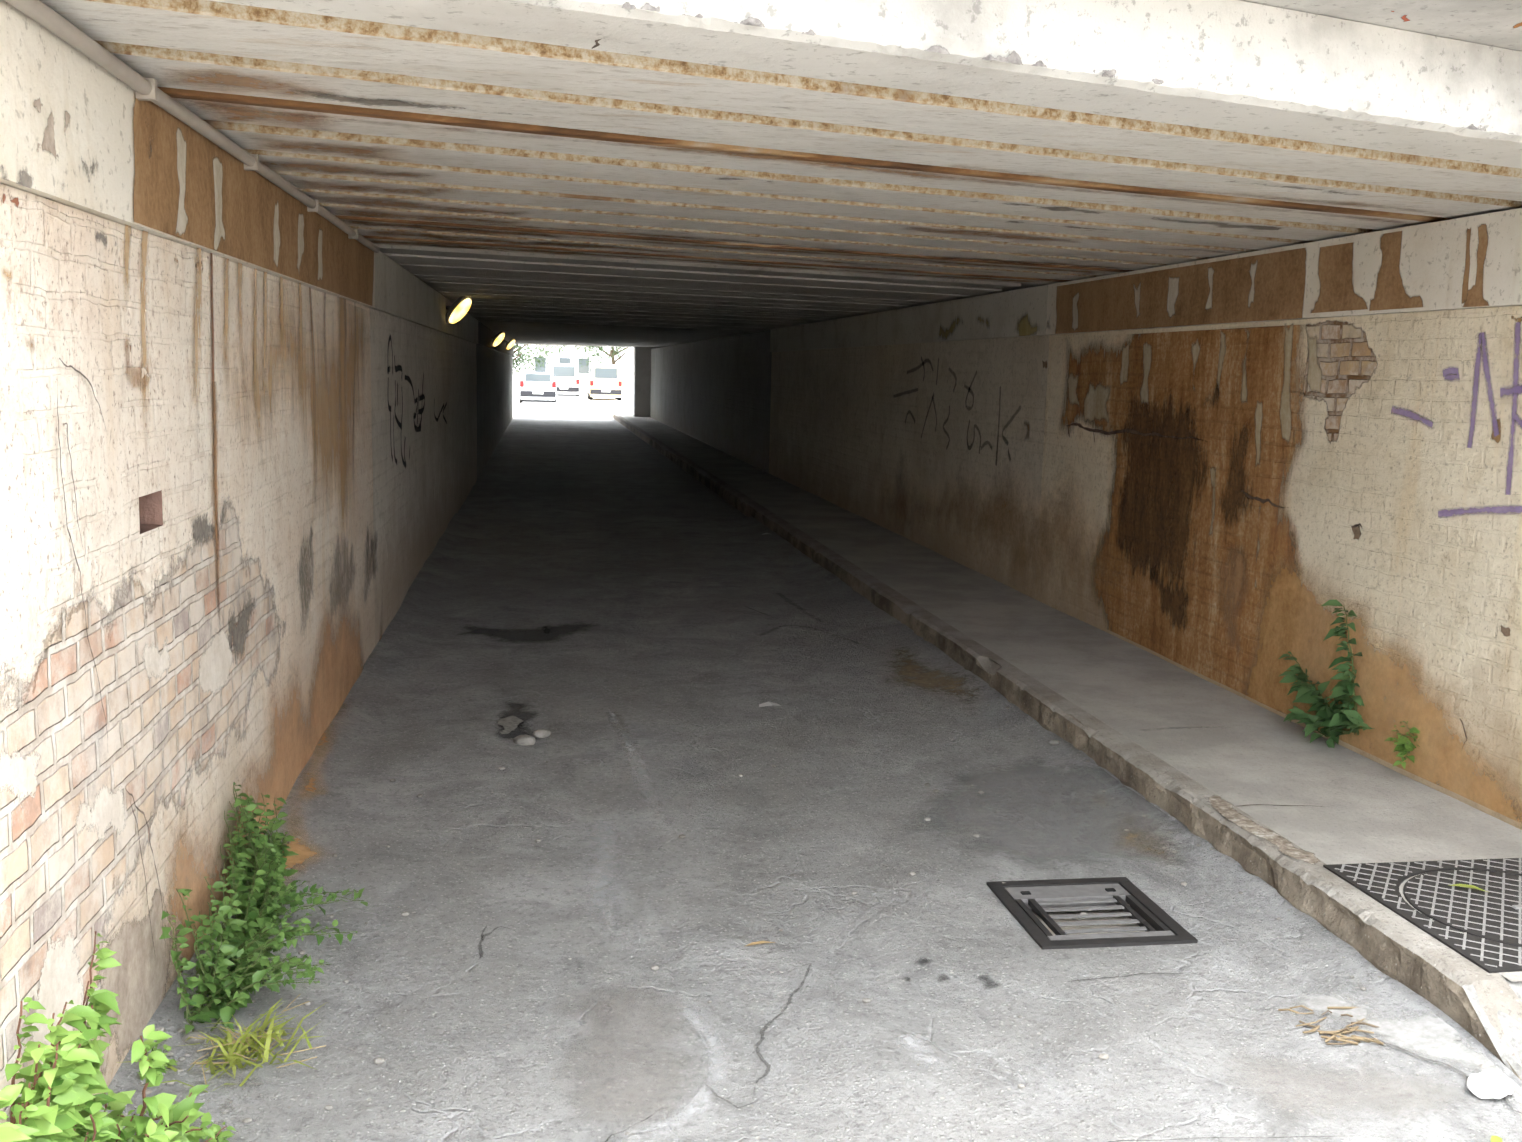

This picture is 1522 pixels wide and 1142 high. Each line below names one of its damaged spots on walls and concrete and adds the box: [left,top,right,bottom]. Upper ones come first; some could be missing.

corrosion [179,72,303,94]
flaking render [34,98,70,158]
corrosion [1462,224,1489,307]
peeling [1303,320,1377,443]
corrosion [1491,419,1501,443]
hole [139,490,163,534]
damp [193,512,225,544]
mould [299,528,377,626]
damp [228,593,255,664]
peeling [0,502,286,1122]
crack [706,966,810,1108]